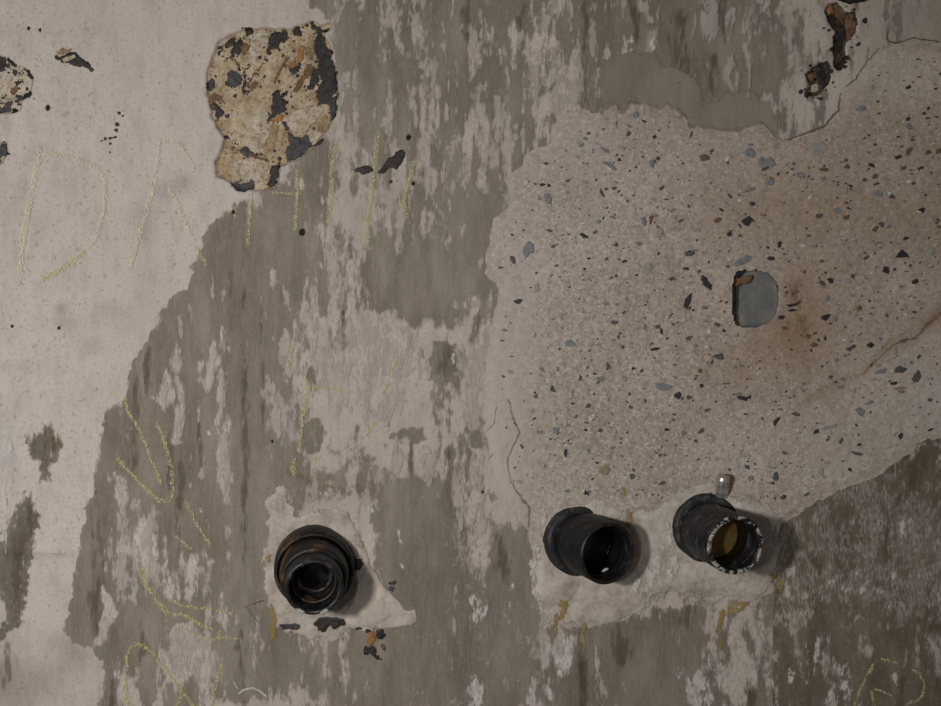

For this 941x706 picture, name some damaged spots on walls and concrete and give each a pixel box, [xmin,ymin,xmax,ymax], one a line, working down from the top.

spalling [0,141,10,164]
spalling [0,54,35,114]
spalling [55,47,94,72]
spalling [206,21,338,192]
damp [64,0,796,706]
spalling [482,0,941,597]
crack [863,312,941,374]
damp [25,424,63,480]
crack [488,401,530,526]
damp [0,427,40,640]
damp [739,438,941,706]